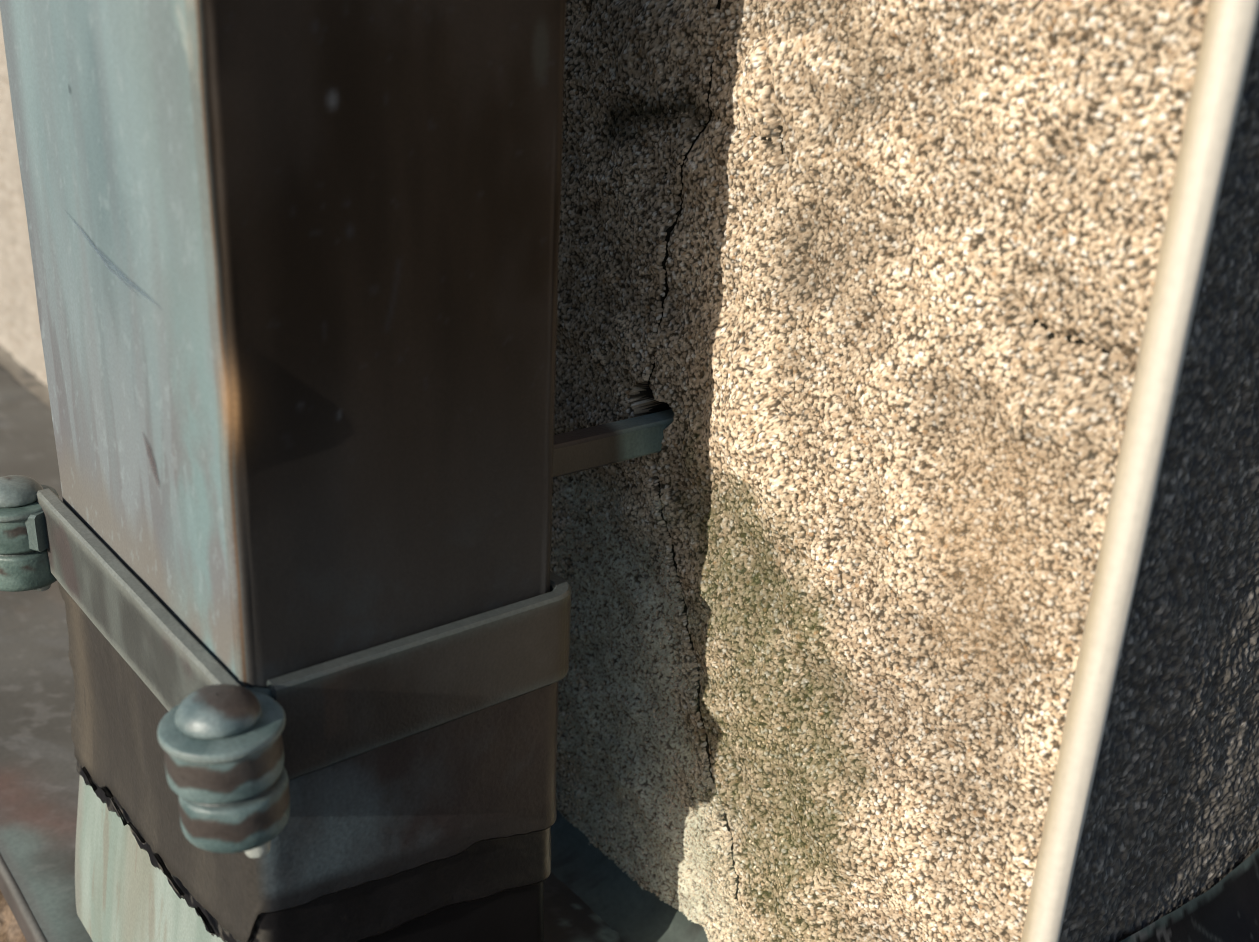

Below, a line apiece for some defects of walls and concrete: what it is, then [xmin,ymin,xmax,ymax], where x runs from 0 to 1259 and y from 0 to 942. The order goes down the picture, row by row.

crack [648,0,789,388]
crack [657,472,748,940]